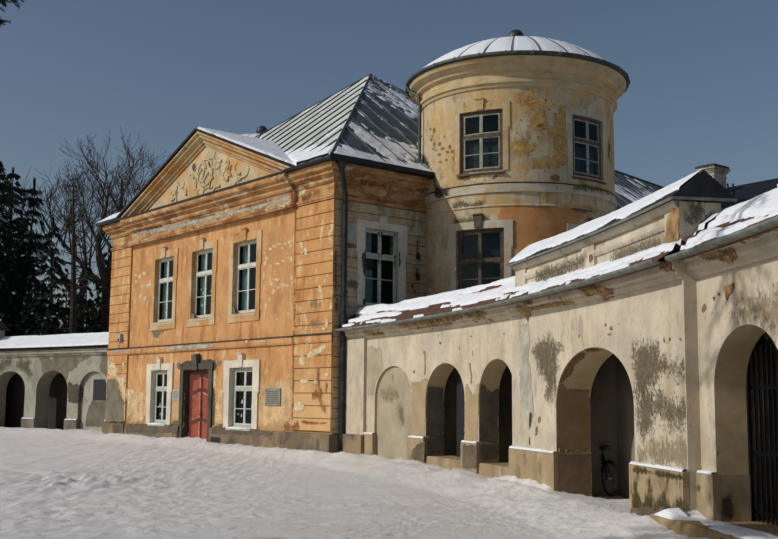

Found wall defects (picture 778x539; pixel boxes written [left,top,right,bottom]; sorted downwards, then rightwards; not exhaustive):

flaking render [510,88,568,171]
flaking render [259,241,308,318]
flaking render [38,348,144,427]
flaking render [298,342,326,365]
leakage [532,333,564,403]
leakage [631,338,686,441]